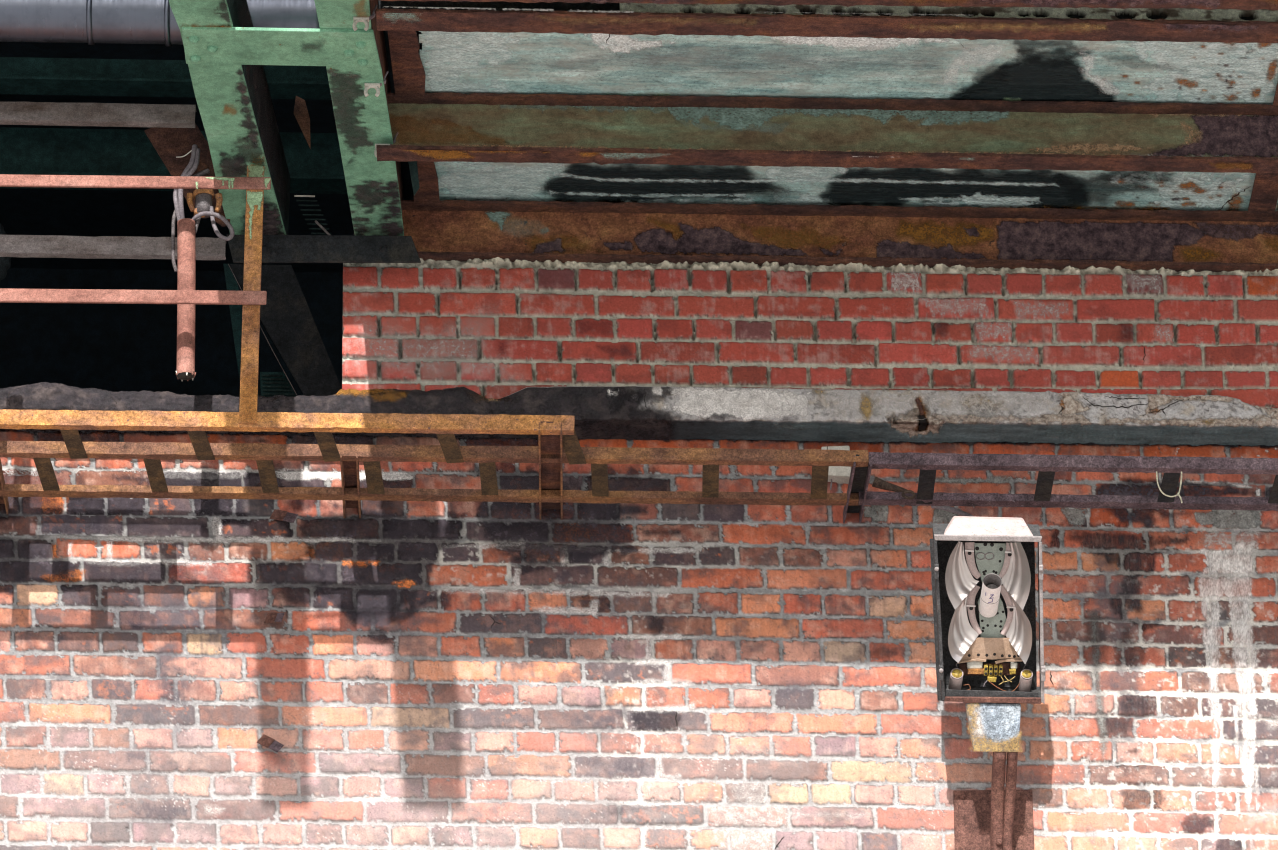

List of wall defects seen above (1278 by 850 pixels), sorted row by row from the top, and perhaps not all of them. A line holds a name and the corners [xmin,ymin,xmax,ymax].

water stain [424,31,519,94]
water stain [585,33,759,69]
water stain [772,36,949,67]
water stain [947,40,1119,102]
water stain [1132,41,1278,104]
peeling [1030,143,1150,154]
water stain [439,156,1249,211]
water stain [613,386,680,423]
spalling [886,392,1278,438]
crack [1059,396,1206,416]
water stain [248,562,326,608]
water stain [1199,531,1278,817]